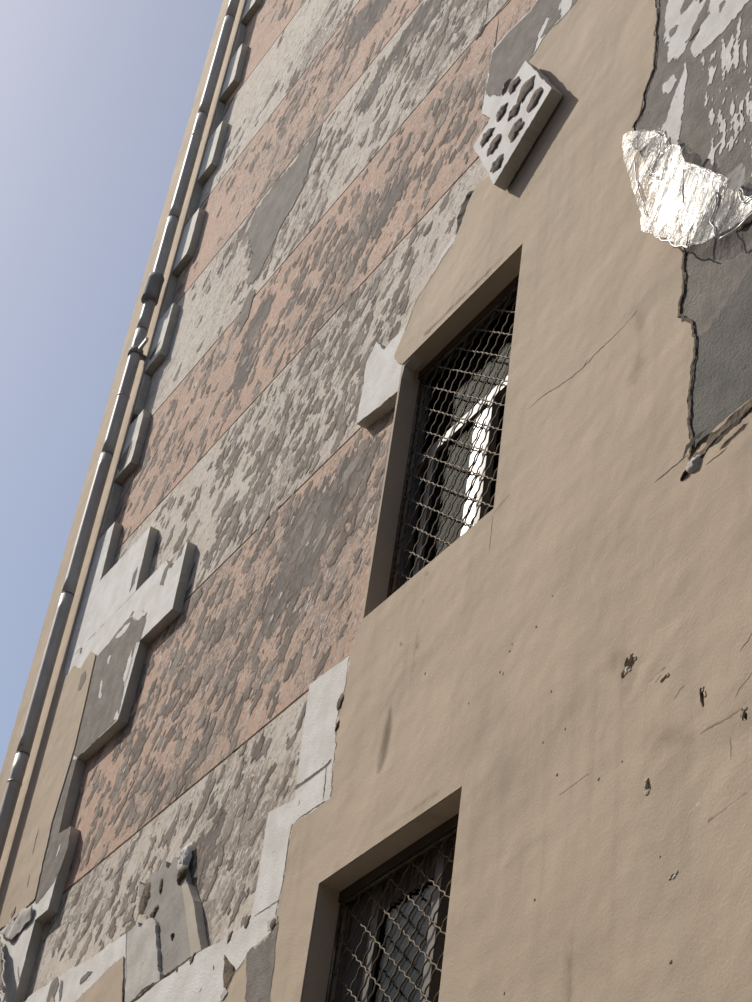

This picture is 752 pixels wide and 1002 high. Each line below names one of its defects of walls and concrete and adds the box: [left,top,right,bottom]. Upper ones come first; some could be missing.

peeling [658,0,752,165]
crack [532,310,637,406]
spalling [680,399,752,481]
peeling [116,609,146,638]
peeling [138,878,163,918]
peeling [176,865,188,886]
spalling [213,915,251,1000]
peeling [245,916,278,1002]